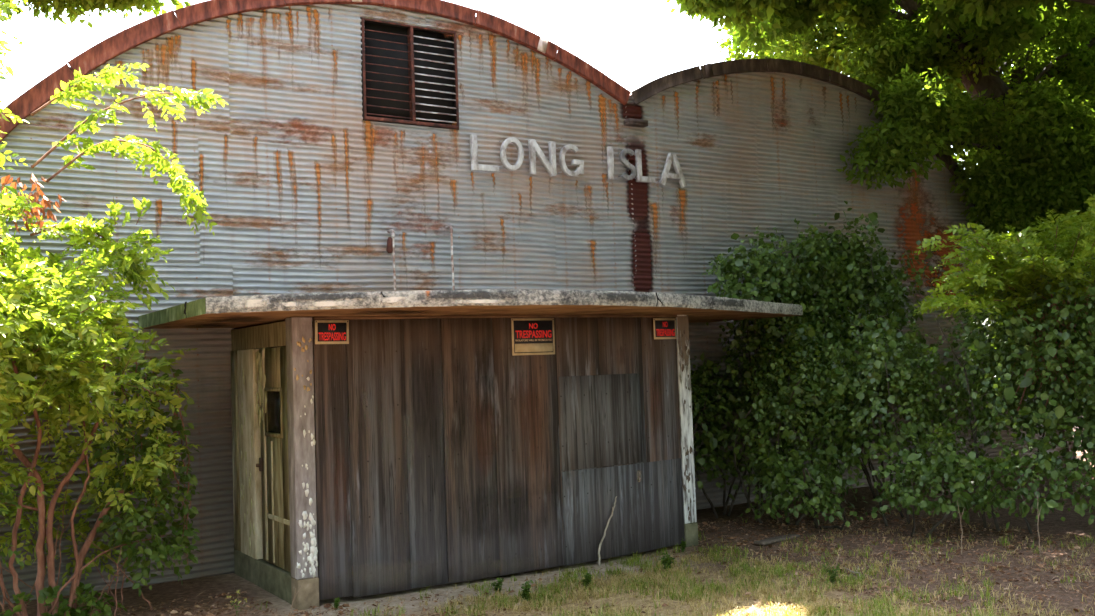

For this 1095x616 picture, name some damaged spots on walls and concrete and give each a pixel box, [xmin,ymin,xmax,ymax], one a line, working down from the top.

rust [226,6,330,51]
rust [191,59,281,95]
rust [186,154,203,192]
rust [208,120,258,159]
rust [271,120,350,244]
rust [362,121,405,167]
rust [395,123,458,264]
rust [437,23,663,292]
rust [896,169,964,296]
peeling [294,337,314,417]
peeling [677,316,691,408]
peeling [296,482,318,578]